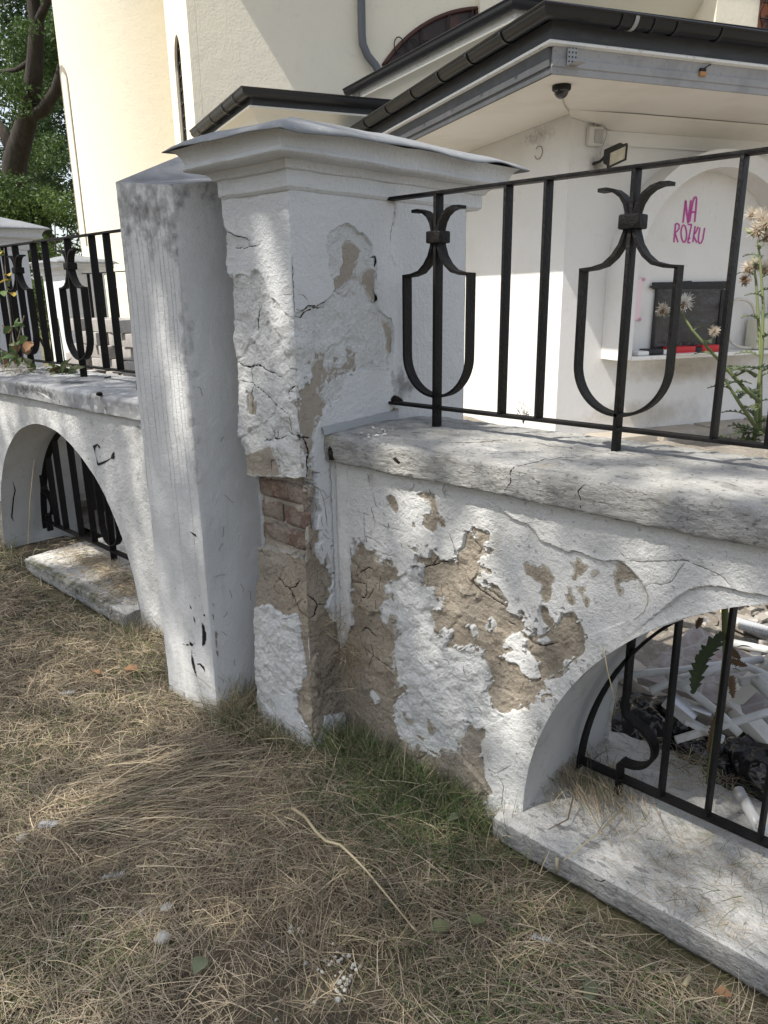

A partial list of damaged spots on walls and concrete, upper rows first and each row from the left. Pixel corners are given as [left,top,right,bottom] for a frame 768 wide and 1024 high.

crack [258,259,329,328]
crack [372,210,396,302]
crack [240,363,327,520]
peeling [226,224,648,812]